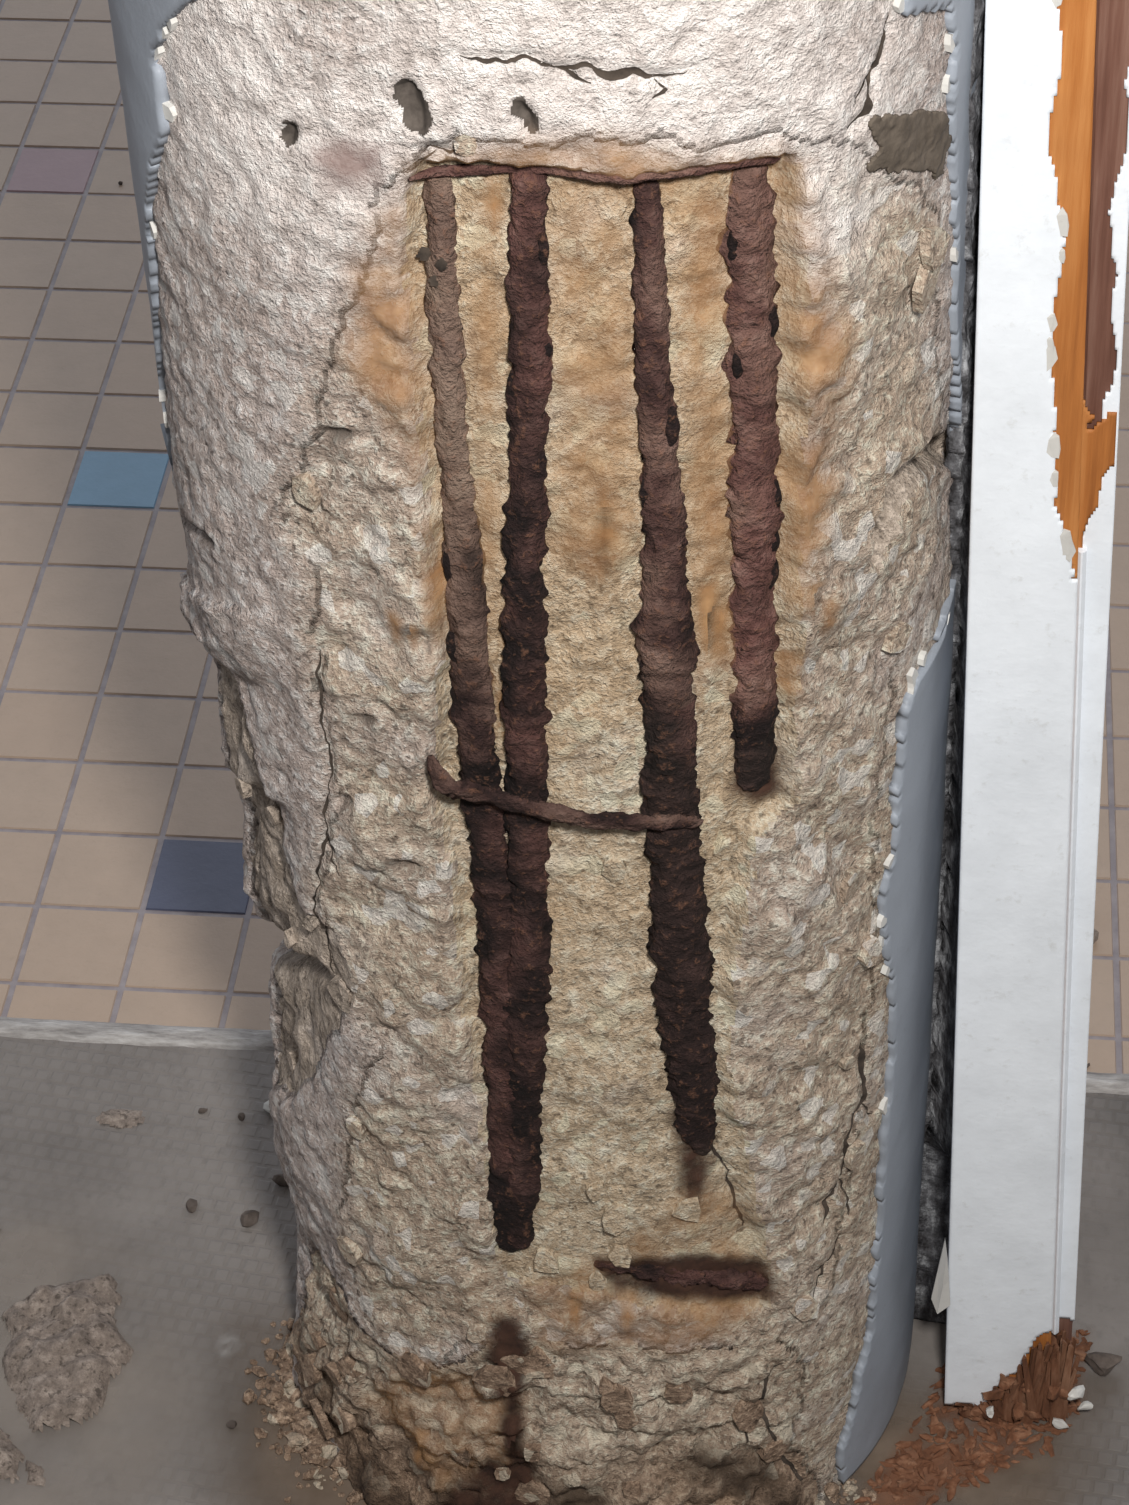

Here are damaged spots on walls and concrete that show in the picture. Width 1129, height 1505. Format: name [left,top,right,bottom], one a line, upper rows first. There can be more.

crack [460,54,687,98]
crack [312,650,340,973]
spalling [207,0,977,1505]
corrosion [735,761,780,799]
corrosion [673,1112,708,1198]
crack [712,1147,744,1226]
crack [813,1043,872,1298]
corrosion [600,1256,773,1335]